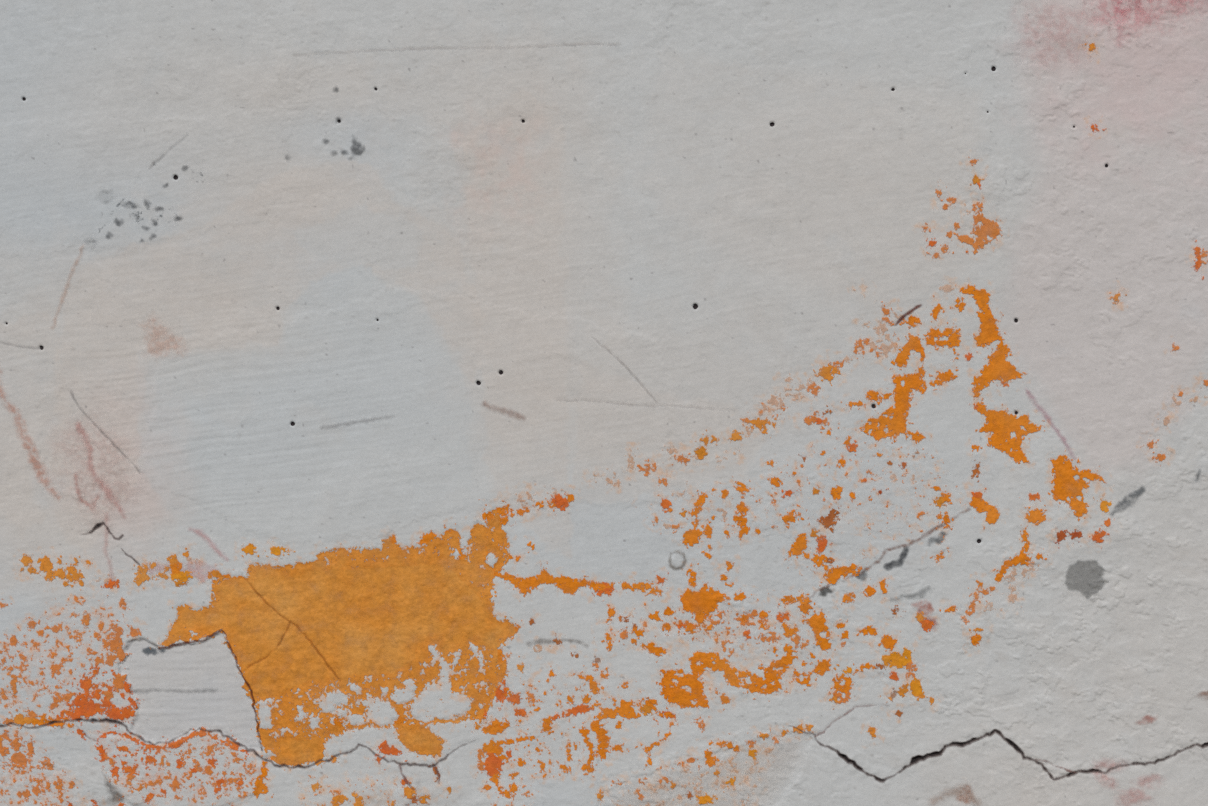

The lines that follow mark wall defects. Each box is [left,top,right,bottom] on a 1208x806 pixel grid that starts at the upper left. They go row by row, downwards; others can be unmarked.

peeling [922,157,1003,258]
peeling [0,284,1112,806]
crack [0,630,448,785]
crack [799,729,1208,782]